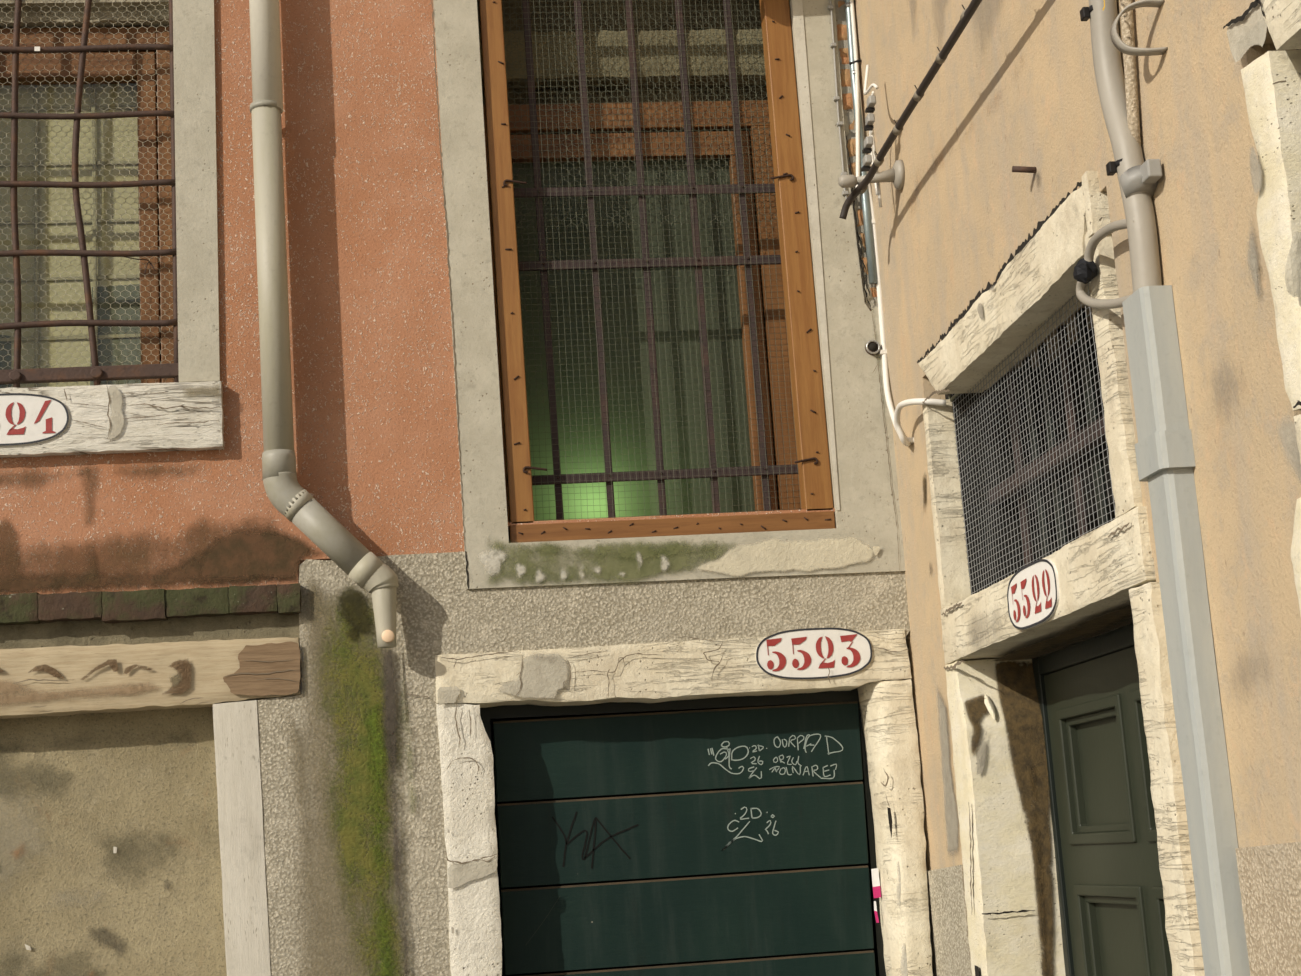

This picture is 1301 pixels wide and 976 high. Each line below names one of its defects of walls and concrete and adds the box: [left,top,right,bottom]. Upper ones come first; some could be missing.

water stain [0,521,316,594]
peeling [223,641,300,696]
spalling [964,694,997,774]
water stain [294,587,396,976]
water stain [109,840,160,871]